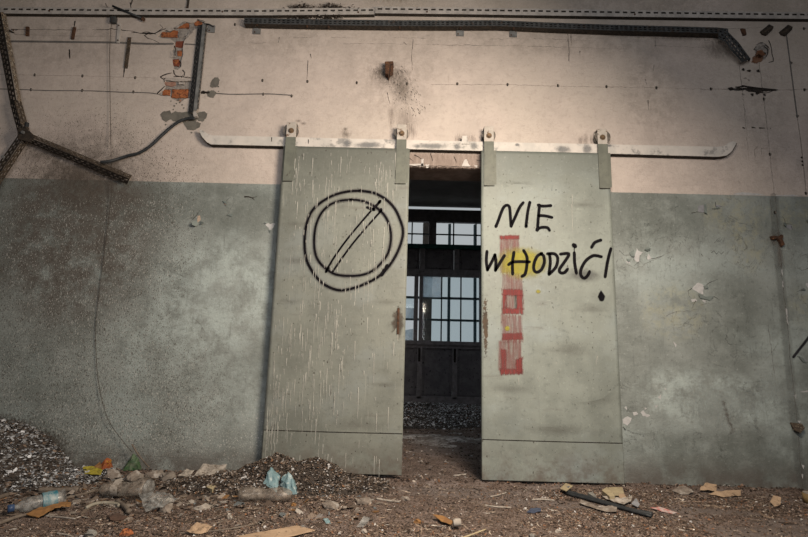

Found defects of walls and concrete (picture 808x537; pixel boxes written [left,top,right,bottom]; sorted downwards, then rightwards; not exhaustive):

flaking render [142,19,205,102]
flaking render [752,40,774,64]
peeling [688,280,718,305]